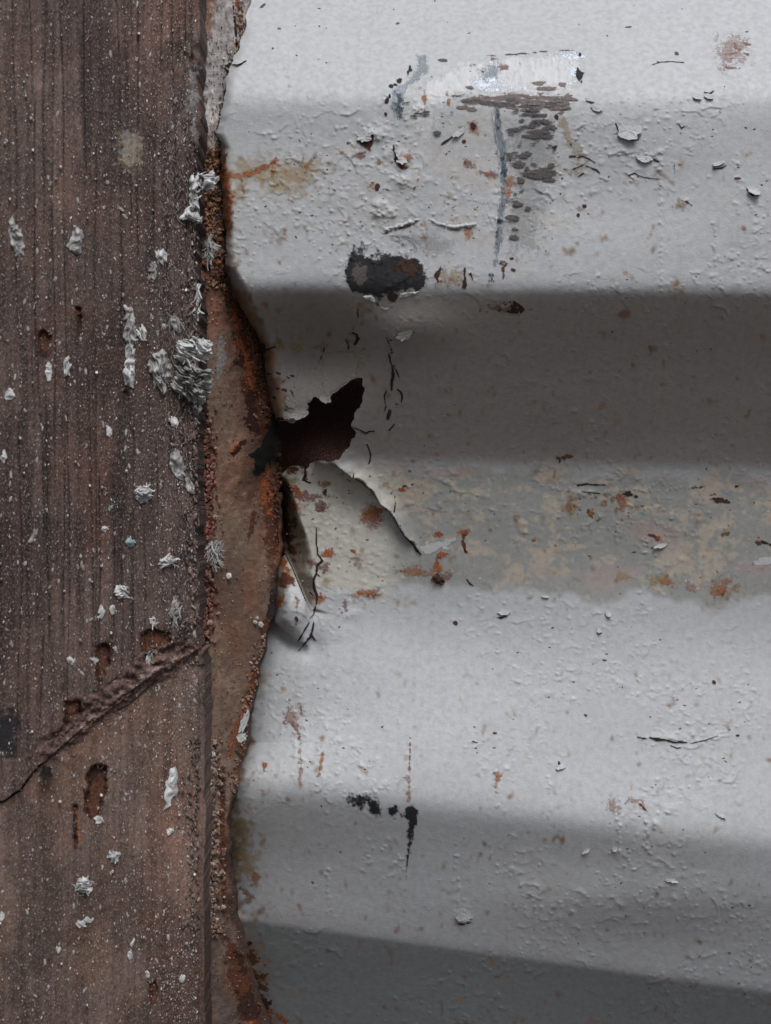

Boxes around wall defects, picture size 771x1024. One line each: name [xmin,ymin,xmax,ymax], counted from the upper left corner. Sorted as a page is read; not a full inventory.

peeling [441,121,478,145]
spalling [552,114,588,173]
rust [221,152,280,240]
peeling [381,218,477,251]
spalling [434,266,473,289]
rust [204,268,285,443]
rust [361,505,382,529]
rust [567,491,638,518]
rust [400,551,452,586]
crack [298,528,323,651]
rust [342,590,380,611]
rust [219,658,288,1024]